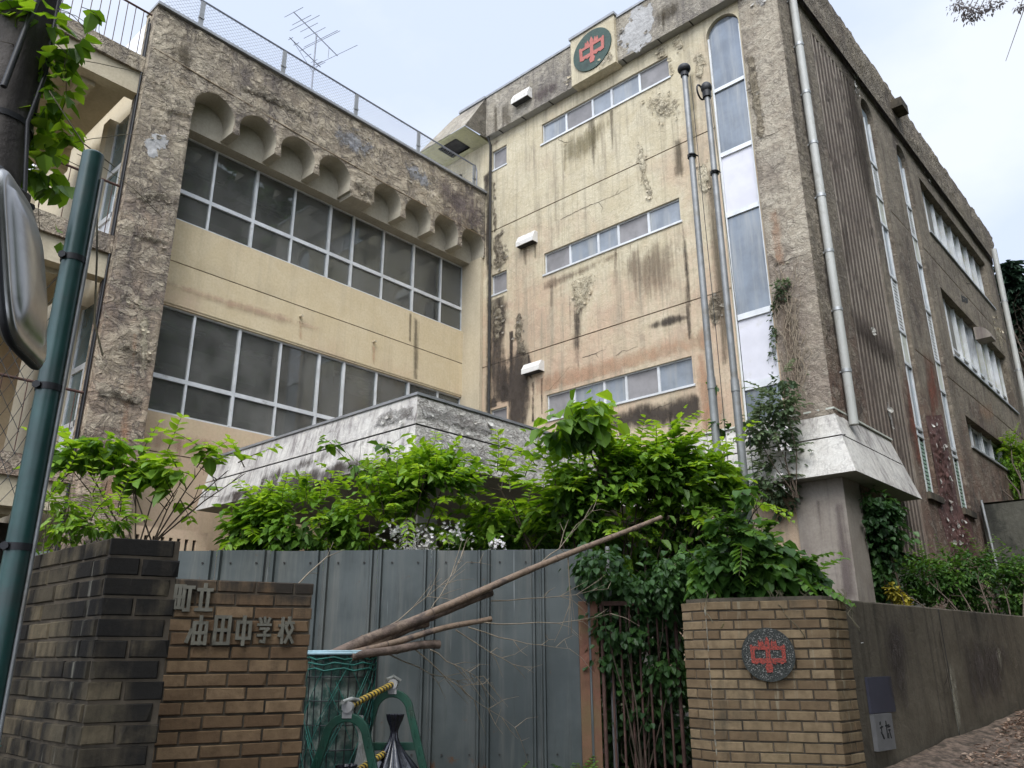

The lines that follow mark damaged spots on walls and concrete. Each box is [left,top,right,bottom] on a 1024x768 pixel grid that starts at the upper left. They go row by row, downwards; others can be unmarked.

spalling [596,3,674,75]
peeling [640,91,679,125]
spalling [144,133,169,158]
leakage [570,120,595,155]
peeling [636,142,653,199]
leakage [443,172,489,266]
peeling [571,275,595,314]
leakage [654,246,690,338]
leakage [486,296,543,424]
leakage [611,395,699,436]